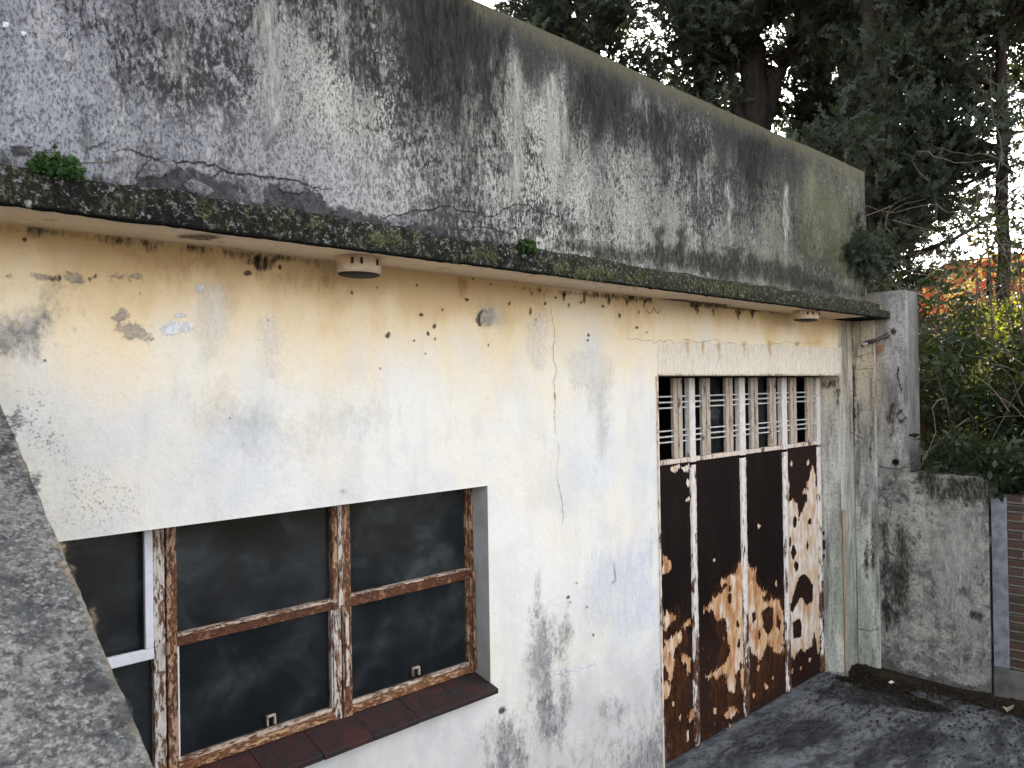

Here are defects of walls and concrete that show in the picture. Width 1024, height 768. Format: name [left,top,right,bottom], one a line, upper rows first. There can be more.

damp [254,0,283,131]
damp [360,0,523,207]
damp [544,60,711,200]
crack [89,142,332,205]
peeling [33,271,96,283]
damp [179,235,222,252]
damp [224,251,295,276]
damp [655,227,688,261]
damp [724,183,742,271]
peeling [112,308,194,341]
damp [529,611,571,740]